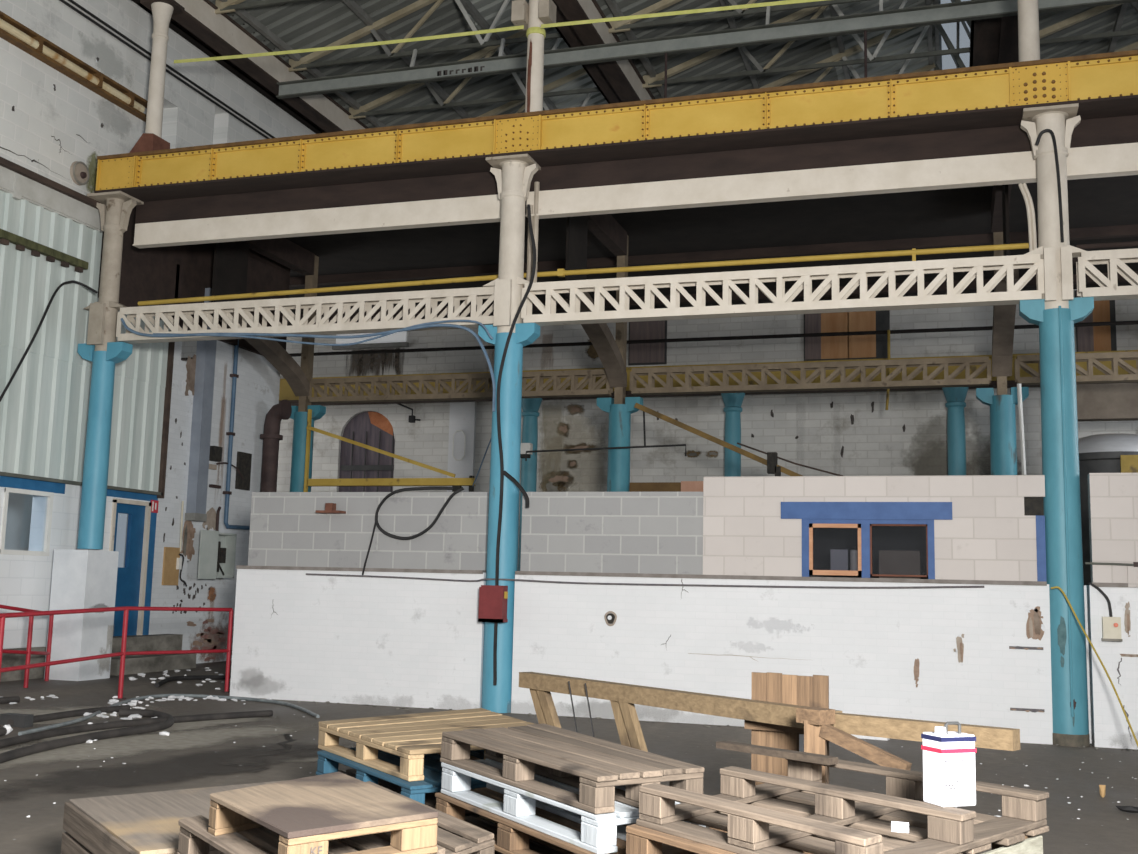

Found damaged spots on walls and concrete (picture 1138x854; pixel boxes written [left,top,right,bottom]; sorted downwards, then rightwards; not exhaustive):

crack [0,134,93,180]
peeling [182,354,196,396]
spalling [540,404,597,492]
spalling [172,583,234,661]
peeling [953,634,964,666]
peeling [1010,606,1067,667]
peeling [1123,602,1131,637]